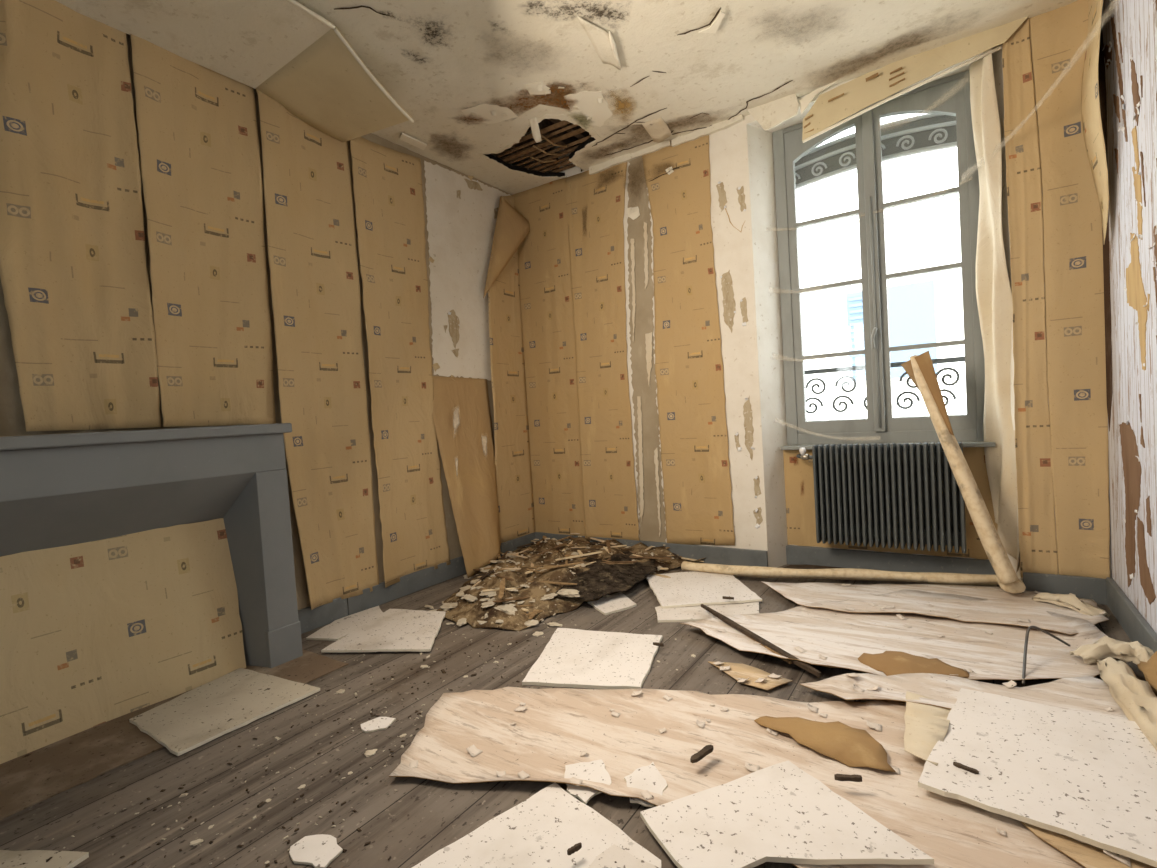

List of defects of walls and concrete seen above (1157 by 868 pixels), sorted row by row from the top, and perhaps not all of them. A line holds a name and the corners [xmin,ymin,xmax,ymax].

damp [530,3,618,19]
spalling [461,103,542,143]
damp [493,85,574,113]
spalling [524,81,613,127]
damp [615,98,633,114]
damp [667,114,711,129]
spalling [716,181,746,212]
peeling [1098,15,1157,370]
peeling [627,207,653,384]
spalling [720,270,748,333]
spalling [734,396,755,460]
peeling [1102,209,1156,605]